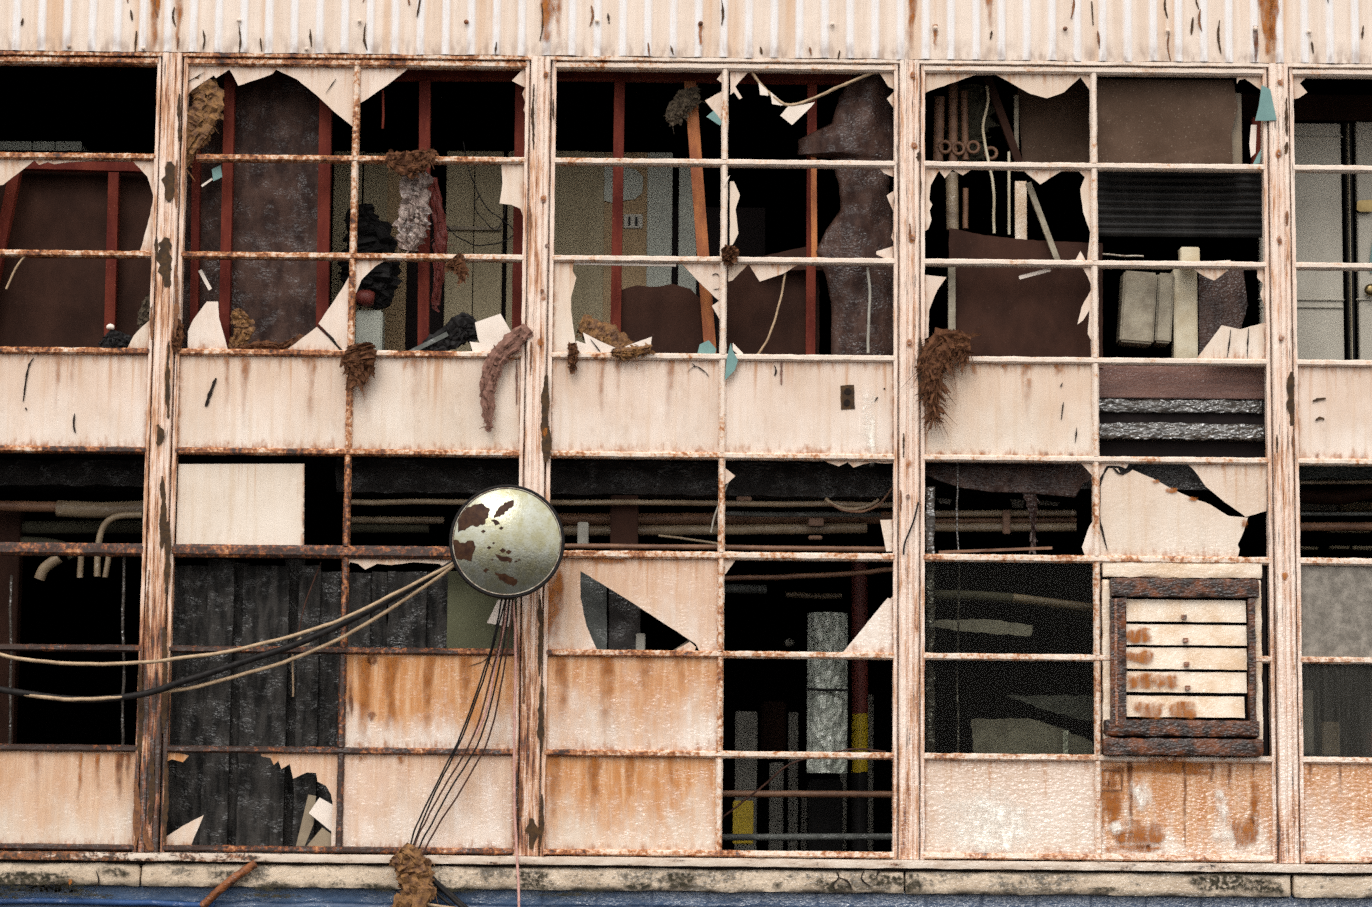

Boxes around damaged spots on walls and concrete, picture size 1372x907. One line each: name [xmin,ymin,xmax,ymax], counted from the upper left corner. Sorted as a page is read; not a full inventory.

corrosion [151,0,160,43]
corrosion [540,0,560,41]
corrosion [1253,0,1279,61]
corrosion [349,655,399,719]
corrosion [424,657,435,704]
corrosion [116,753,130,783]
corrosion [1101,762,1232,852]
corrosion [1232,765,1259,845]